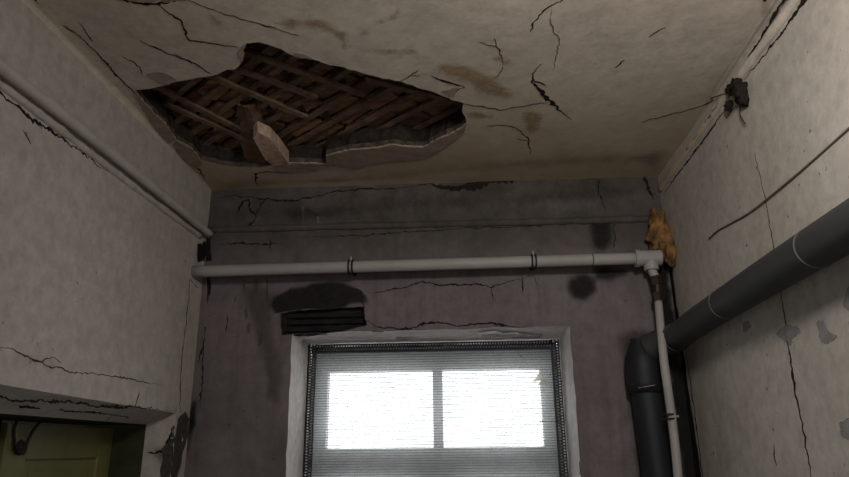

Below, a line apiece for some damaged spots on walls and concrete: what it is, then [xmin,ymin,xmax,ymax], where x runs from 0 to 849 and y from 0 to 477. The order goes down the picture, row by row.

crack [62,23,142,93]
crack [123,0,299,74]
flaking render [135,42,467,173]
crack [401,0,572,153]
crack [744,0,807,80]
crack [642,100,725,199]
crack [217,171,514,248]
crack [0,279,228,421]
crack [366,320,534,330]
crack [368,275,538,299]
crack [781,297,811,476]
flaking render [147,412,189,477]